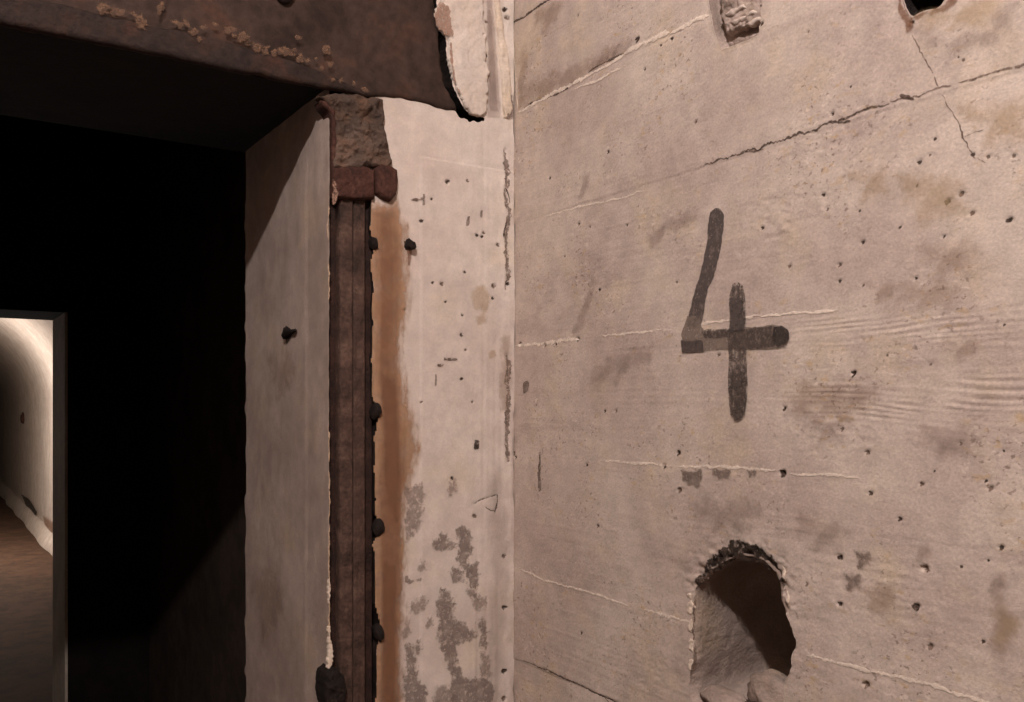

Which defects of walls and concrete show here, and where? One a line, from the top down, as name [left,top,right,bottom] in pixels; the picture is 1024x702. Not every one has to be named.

flaking render [434,0,490,117]
crack [706,37,1024,165]
hole [904,0,944,16]
corrosion [370,202,420,702]
hole [687,539,797,702]